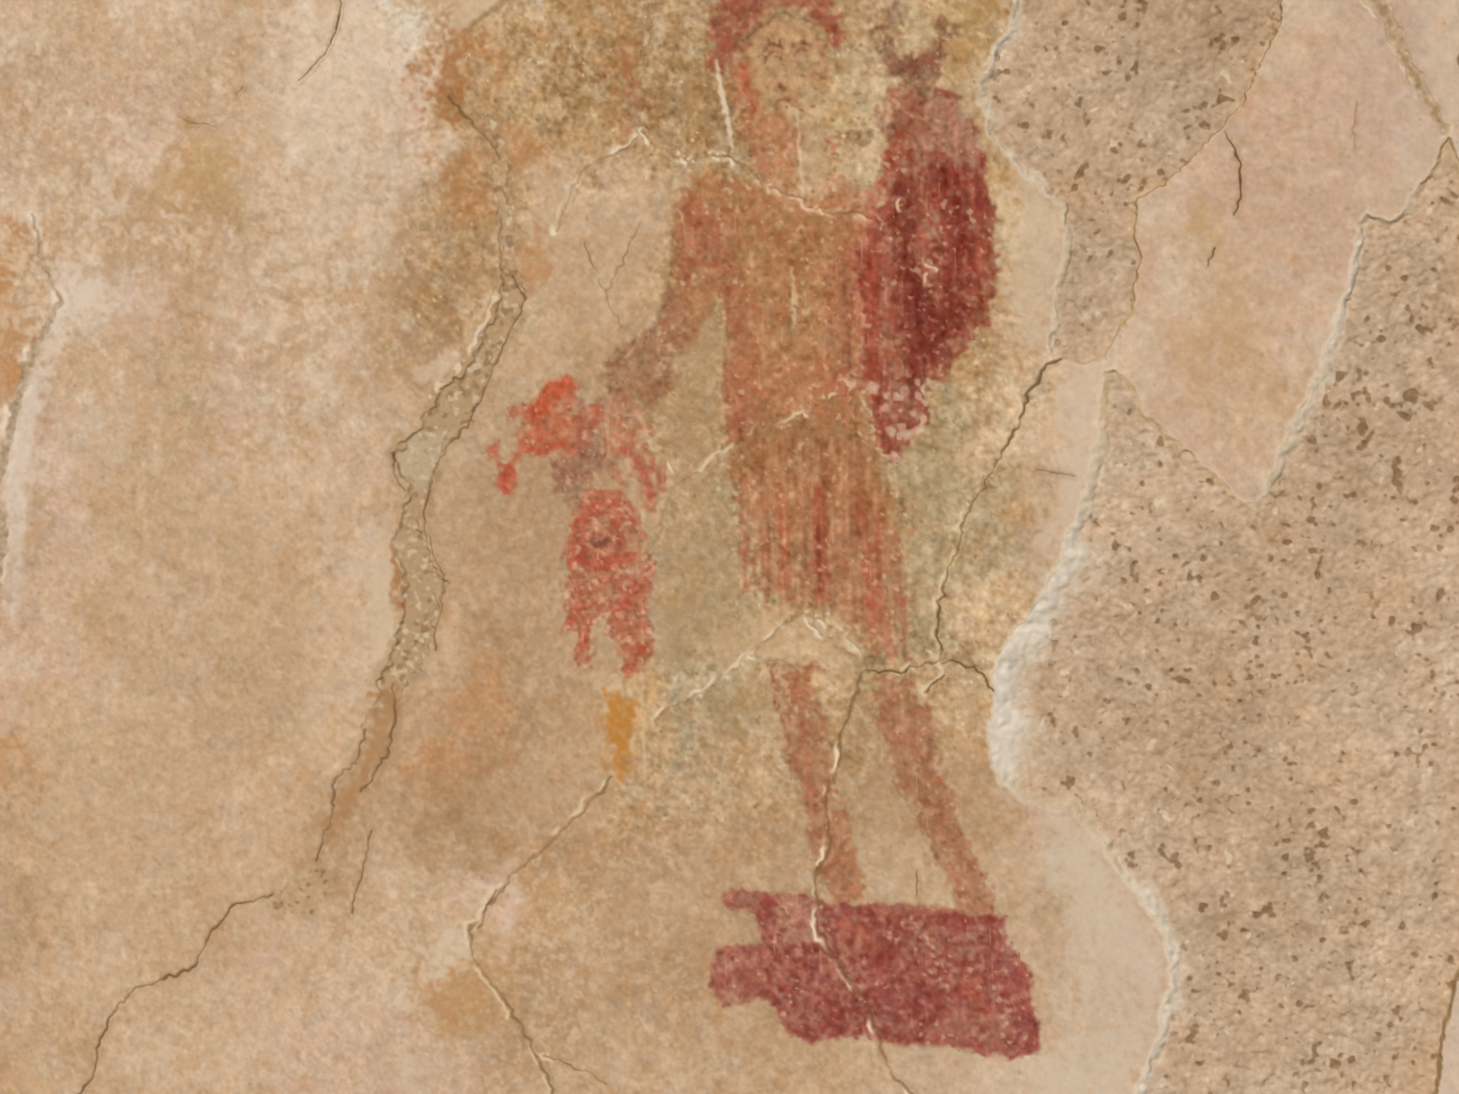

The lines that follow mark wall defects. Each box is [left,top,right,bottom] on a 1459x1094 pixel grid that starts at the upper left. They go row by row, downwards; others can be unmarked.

crack [633,0,659,66]
crack [1349,96,1361,152]
crack [1358,0,1459,141]
crack [0,202,73,647]
crack [72,92,1077,1094]
spalling [974,0,1459,1094]